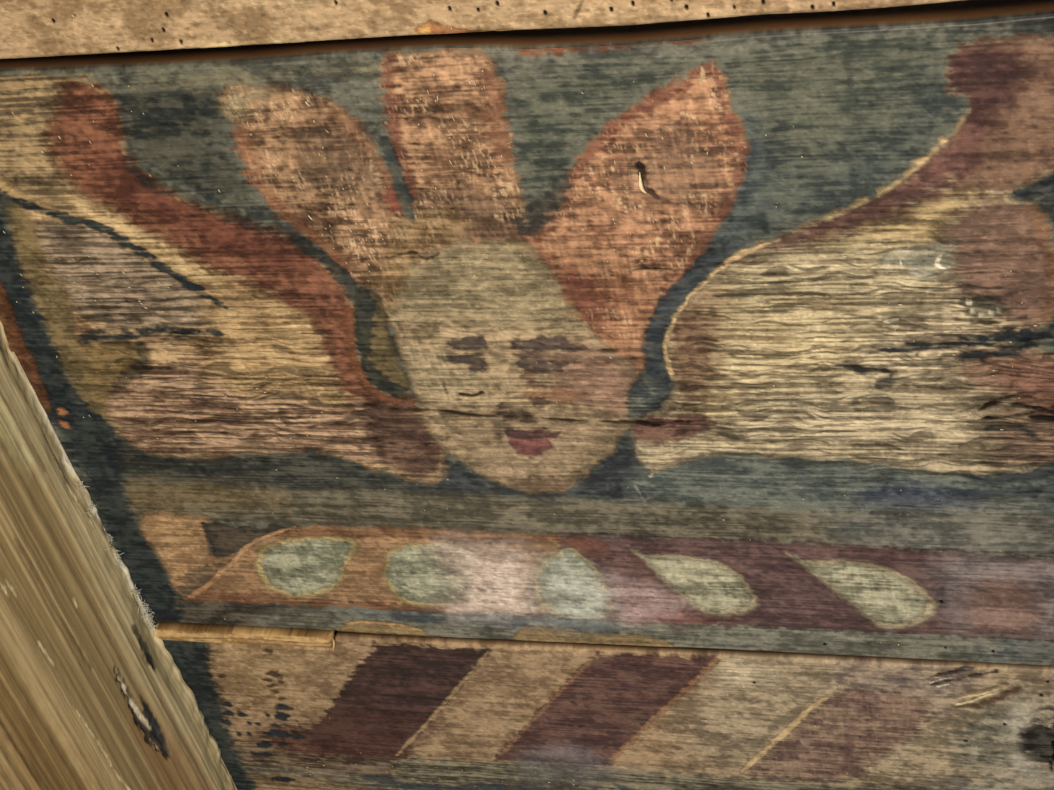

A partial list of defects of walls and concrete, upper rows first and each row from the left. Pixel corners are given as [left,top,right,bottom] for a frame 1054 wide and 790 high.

crack [978,395,1054,422]